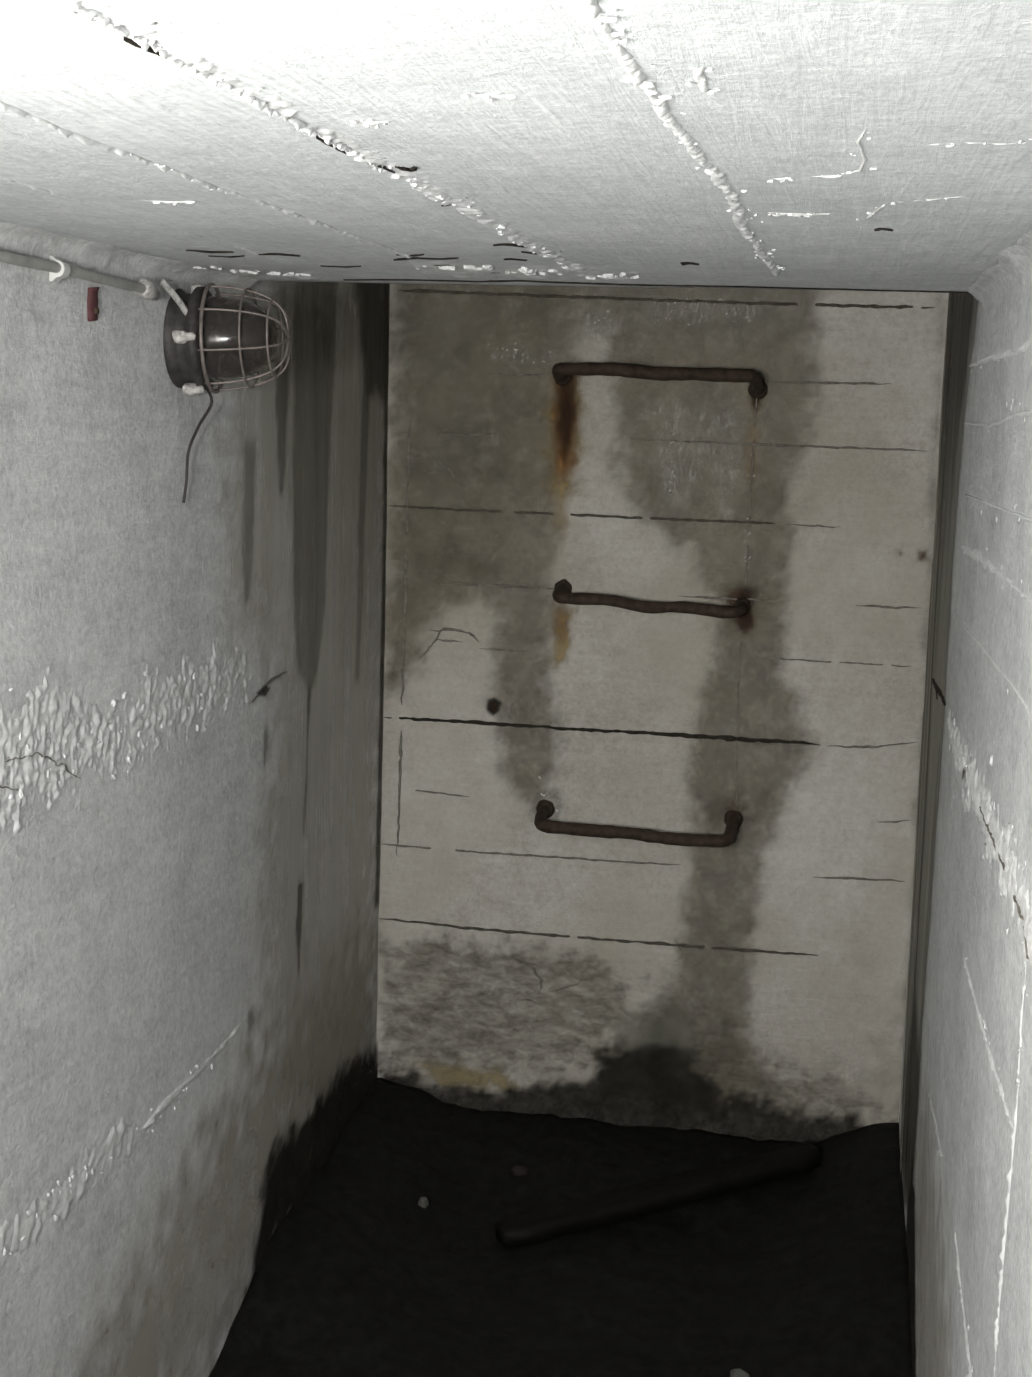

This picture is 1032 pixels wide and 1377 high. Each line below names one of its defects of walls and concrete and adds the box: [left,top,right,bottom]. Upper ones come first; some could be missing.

crack [395,165,418,173]
crack [874,225,893,233]
rust [550,375,576,499]
rust [556,613,569,662]
leakage [358,283,814,1101]